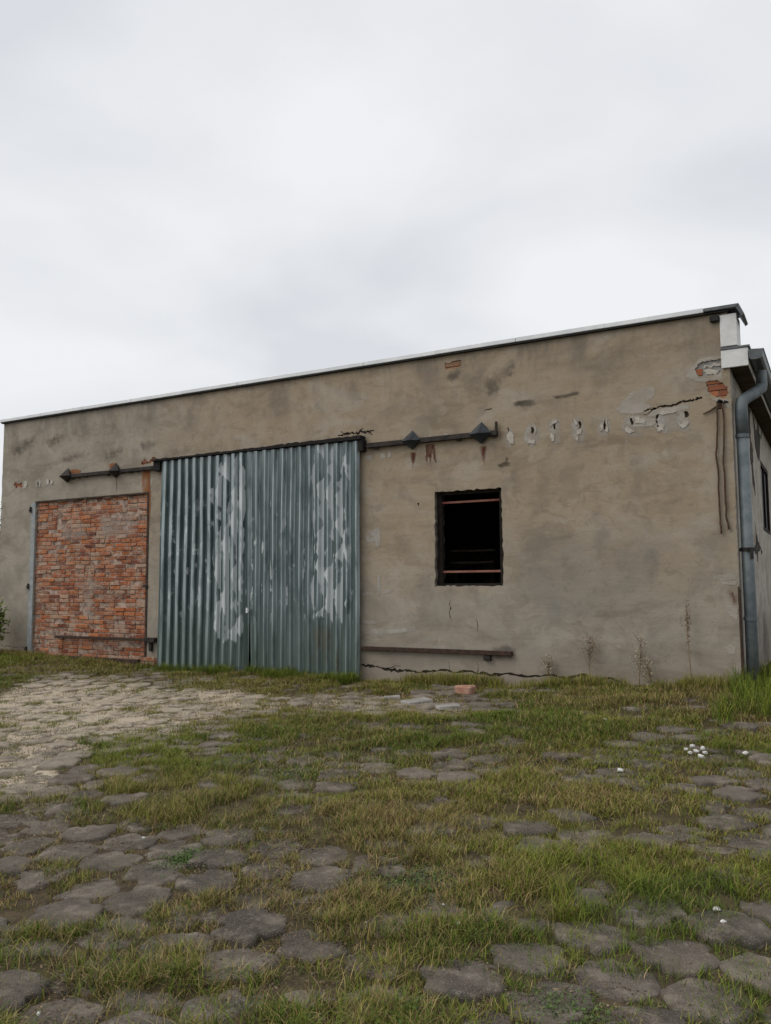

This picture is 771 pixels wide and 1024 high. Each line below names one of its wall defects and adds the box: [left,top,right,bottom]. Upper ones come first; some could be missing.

flaking render [686,357,729,410]
flaking render [617,387,689,434]
crack [644,397,702,415]
crack [339,428,375,436]
crack [361,664,620,682]